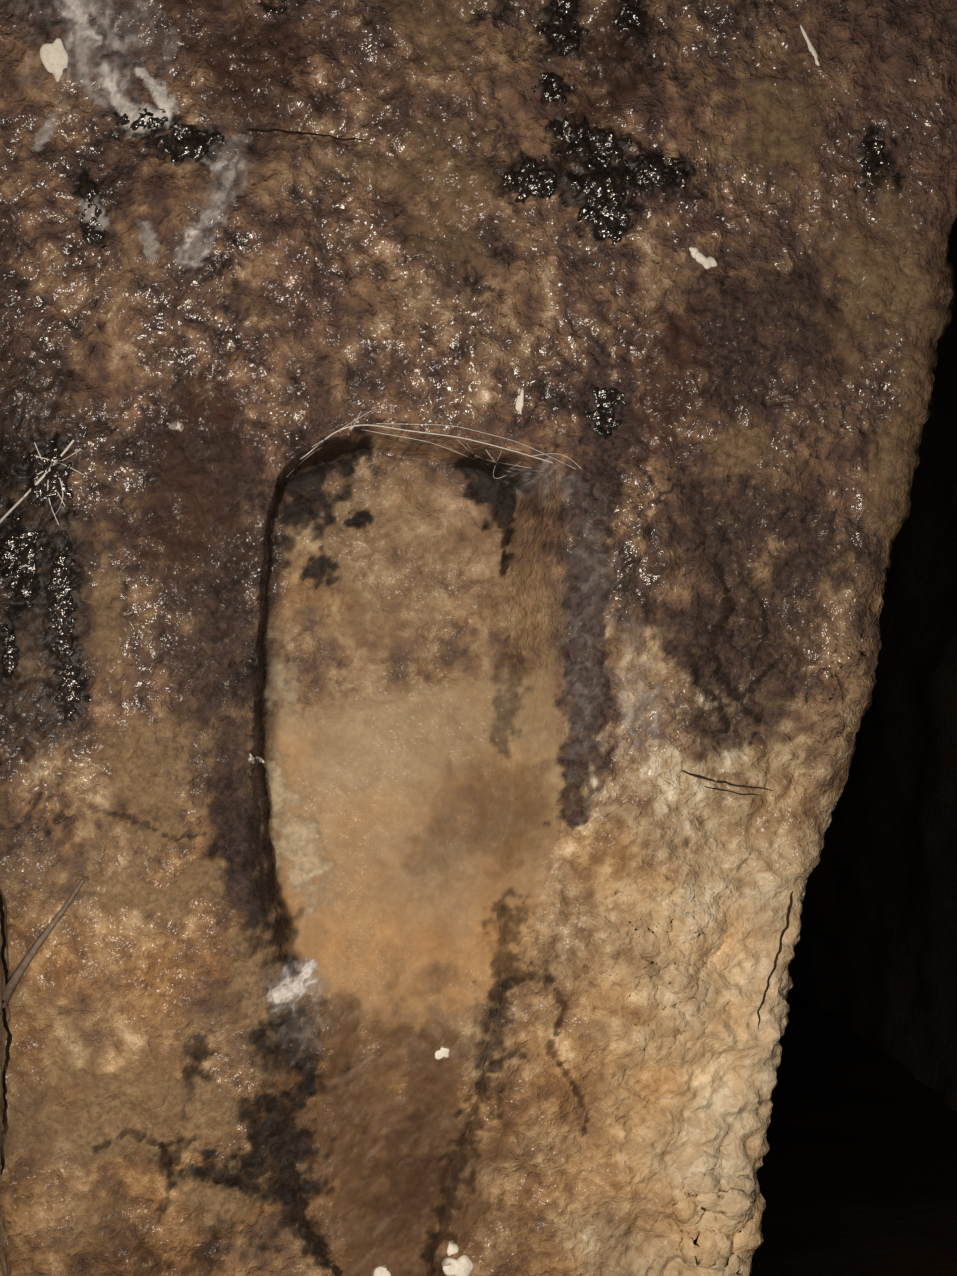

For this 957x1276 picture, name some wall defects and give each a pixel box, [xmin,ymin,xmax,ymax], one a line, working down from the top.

damp [62,0,121,47]
damp [612,0,648,47]
damp [100,63,177,132]
damp [211,160,244,172]
damp [176,206,223,266]
damp [498,471,522,575]
damp [0,614,22,680]
damp [31,523,78,660]
damp [556,340,638,828]
damp [643,479,858,758]
damp [139,384,501,1276]
crack [0,894,12,1175]